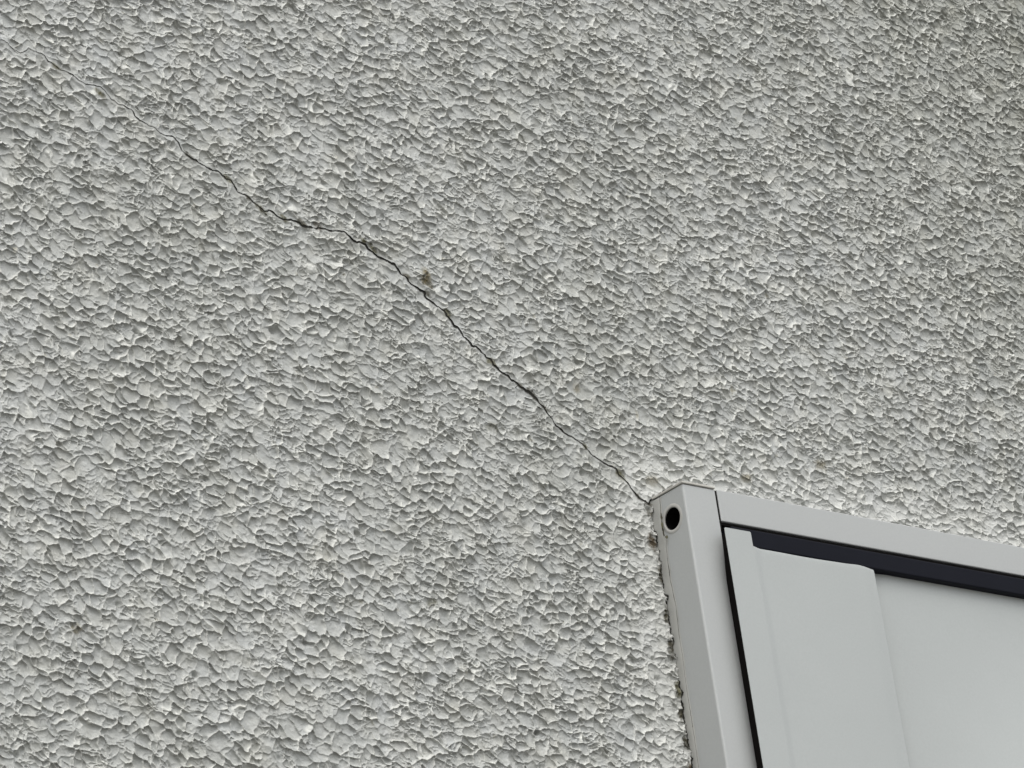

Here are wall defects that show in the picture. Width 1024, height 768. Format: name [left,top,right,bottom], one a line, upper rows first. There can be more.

crack [1,39,699,768]